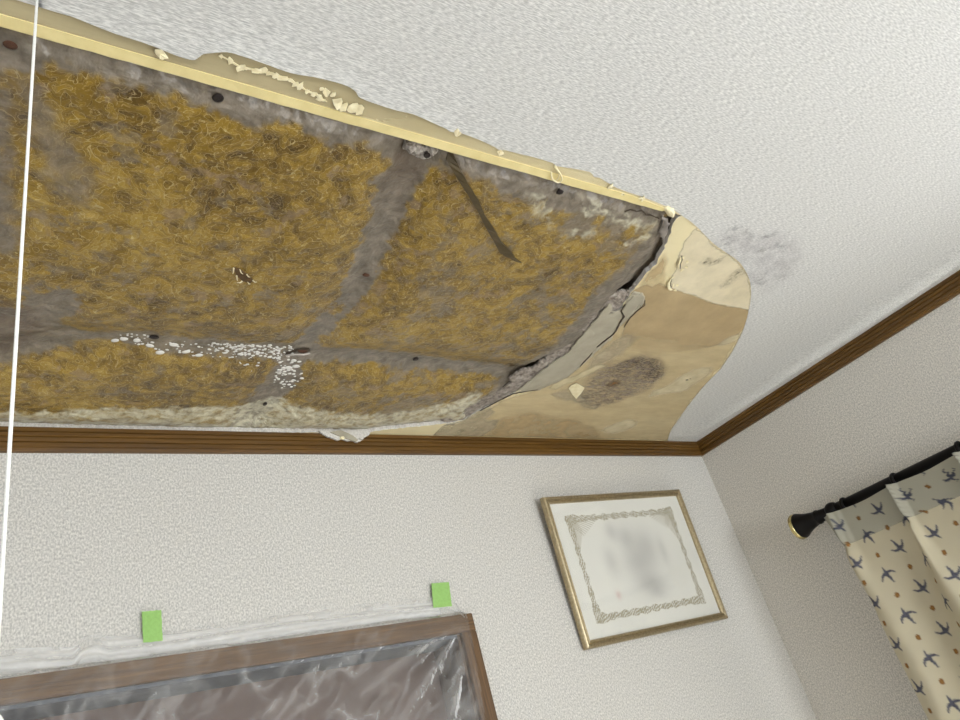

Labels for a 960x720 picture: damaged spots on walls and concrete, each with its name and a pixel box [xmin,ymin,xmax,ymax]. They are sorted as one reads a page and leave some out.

peeling [219,54,364,115]
spalling [440,283,645,426]
water stain [460,261,748,440]